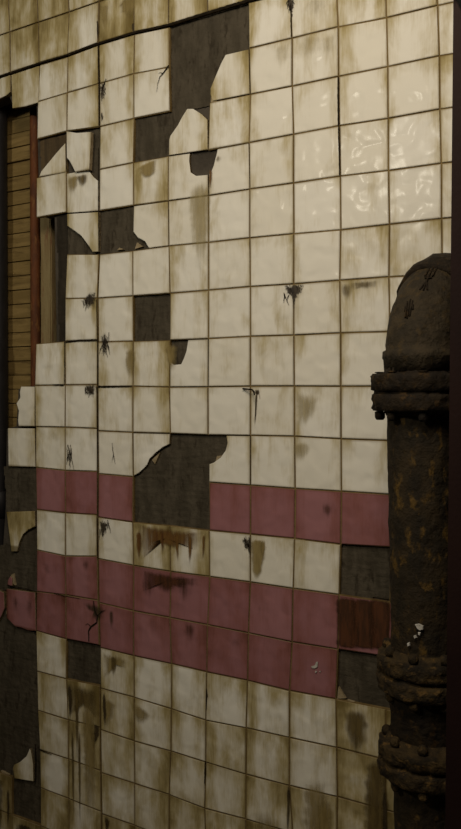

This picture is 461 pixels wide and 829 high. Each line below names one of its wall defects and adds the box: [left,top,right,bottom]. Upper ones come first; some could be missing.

crack [0,0,254,126]
spalling [135,2,251,162]
crack [334,77,342,175]
crack [94,147,102,251]
spalling [57,206,151,342]
spalling [135,294,188,365]
crack [53,300,132,558]
spalling [135,433,230,530]
corrosion [136,526,193,558]
leakage [68,686,112,808]
leakage [347,712,366,748]
leakage [366,764,387,829]